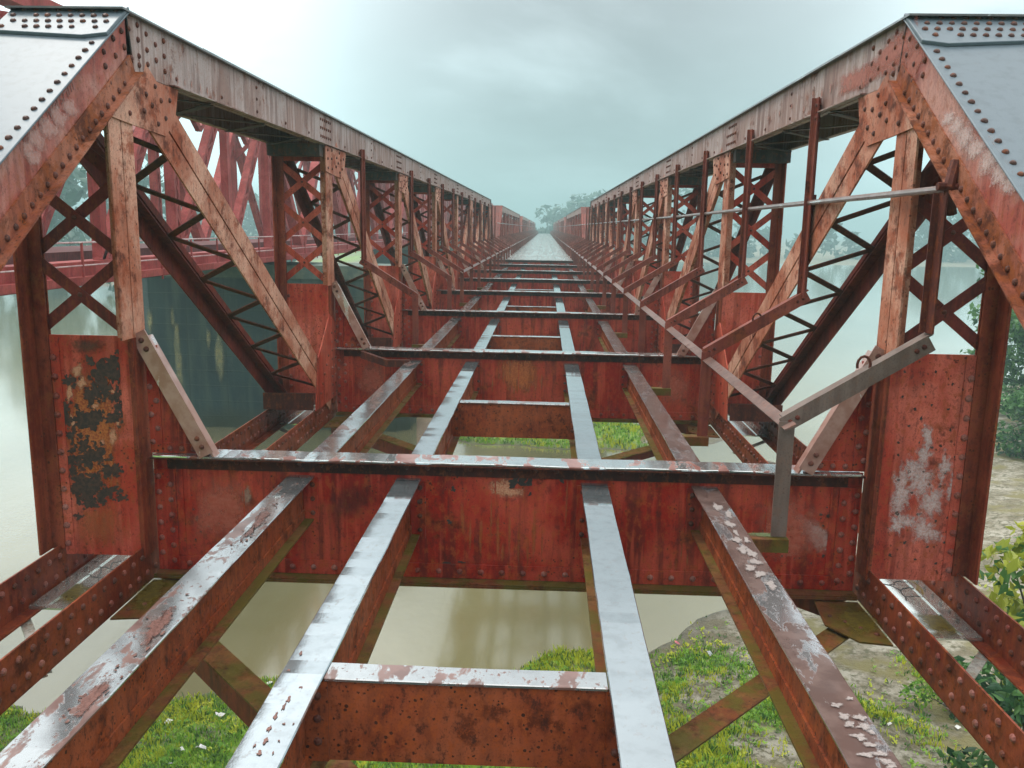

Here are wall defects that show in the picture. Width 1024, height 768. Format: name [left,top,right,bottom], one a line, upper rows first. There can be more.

peeling [67,365,87,401]
peeling [492,478,533,497]
peeling [891,408,955,548]
peeling [230,503,278,549]
peeling [713,504,777,590]
peeling [133,606,176,656]
peeling [62,664,123,723]
spalling [253,686,303,755]
peeling [831,696,897,768]